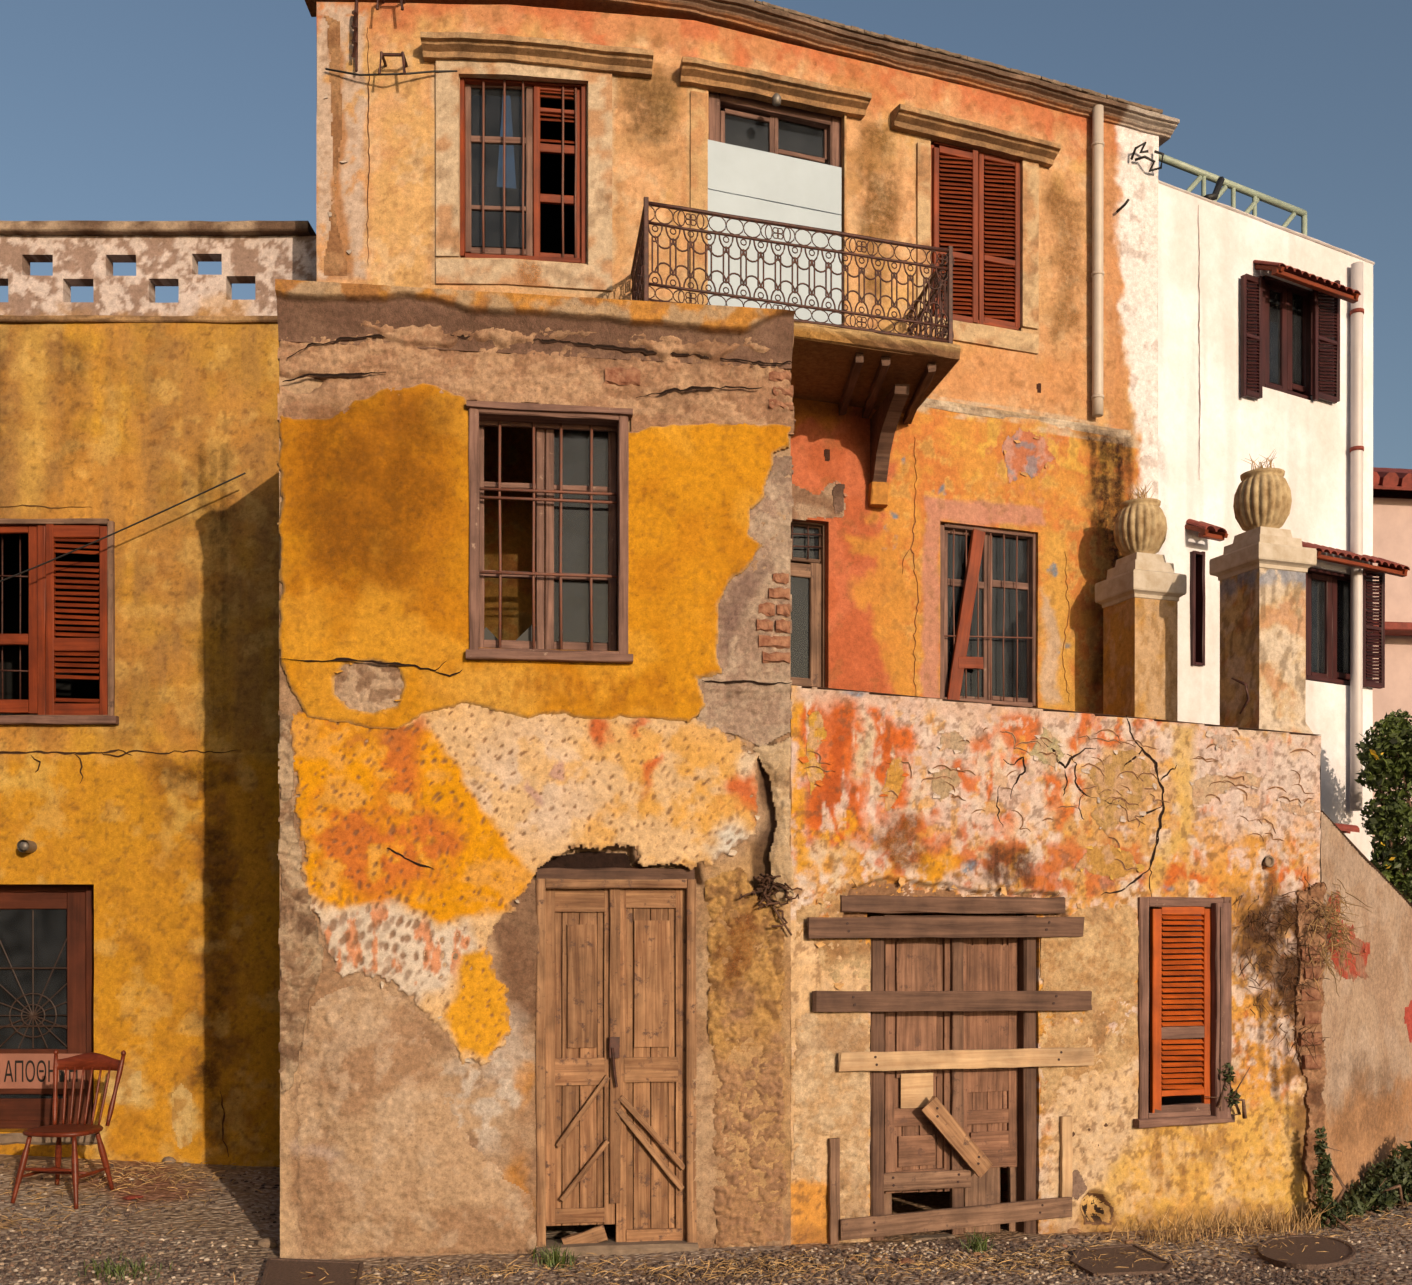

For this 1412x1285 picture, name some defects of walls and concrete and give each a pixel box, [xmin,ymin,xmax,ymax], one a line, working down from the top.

spalling [277,320,796,437]
peeling [1002,428,1056,484]
damp [1084,429,1128,568]
crack [1062,554,1070,703]
crack [0,749,236,783]
flaking render [277,455,848,1093]
peeling [879,727,1065,814]
crack [996,715,1177,897]
peeling [1011,729,1166,881]
peeling [1189,729,1320,842]